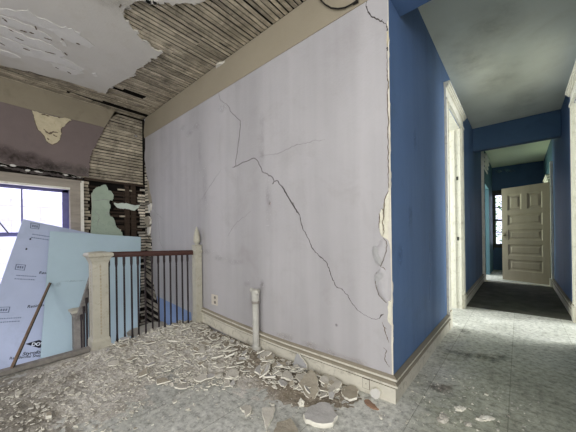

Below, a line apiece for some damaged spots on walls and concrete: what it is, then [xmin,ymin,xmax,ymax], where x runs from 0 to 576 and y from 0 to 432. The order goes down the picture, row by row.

flaking render [0,0,305,326]
crack [219,96,390,367]